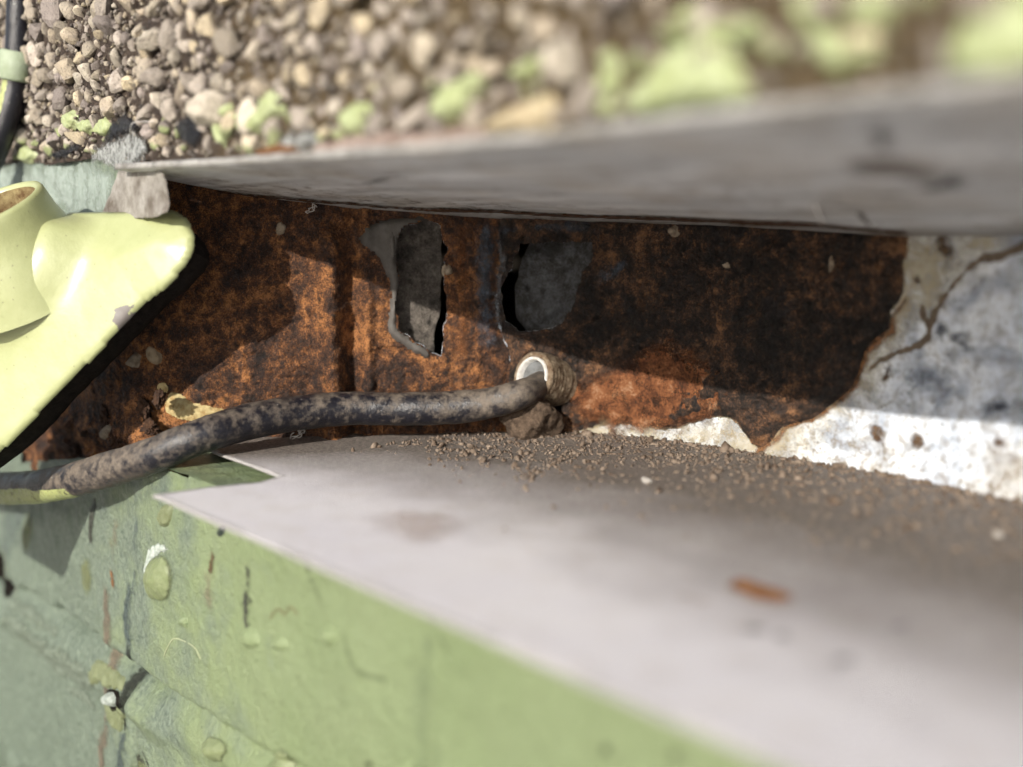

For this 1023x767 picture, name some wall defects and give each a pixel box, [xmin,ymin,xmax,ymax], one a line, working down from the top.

peeling [358,216,430,358]
rust [21,180,998,470]
crack [869,241,1023,371]
crack [119,650,148,731]